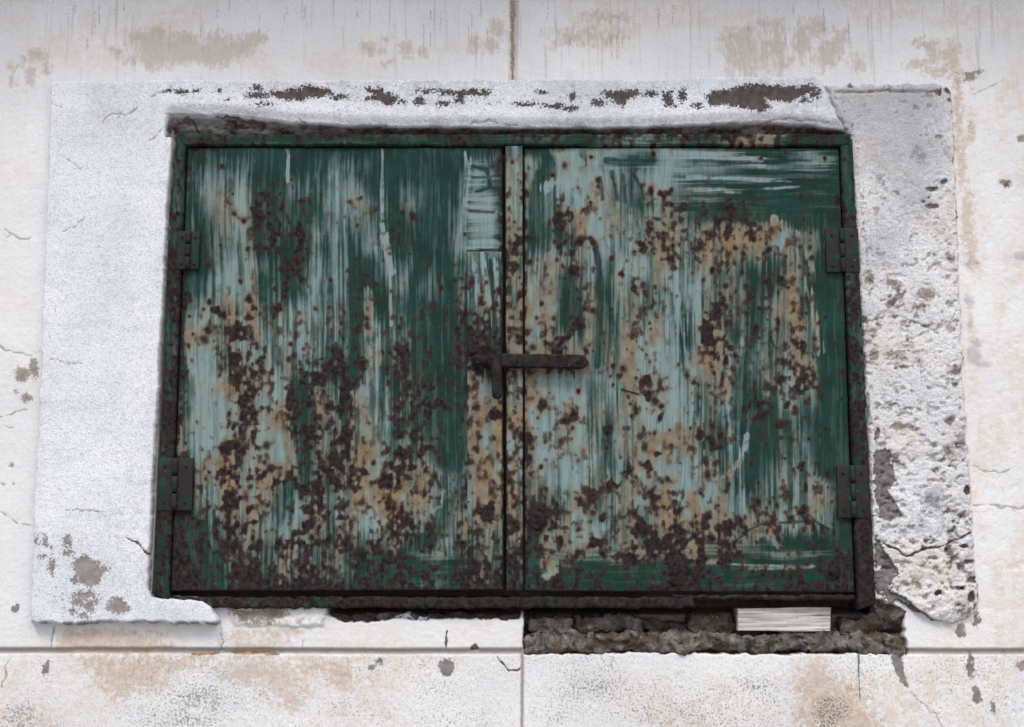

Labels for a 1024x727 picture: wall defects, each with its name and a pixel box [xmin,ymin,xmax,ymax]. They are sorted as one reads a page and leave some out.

peeling [243,83,349,107]
peeling [364,86,496,109]
peeling [511,82,822,114]
flaking render [873,428,903,521]
crack [882,532,972,557]
peeling [33,533,131,620]
spalling [331,535,914,657]